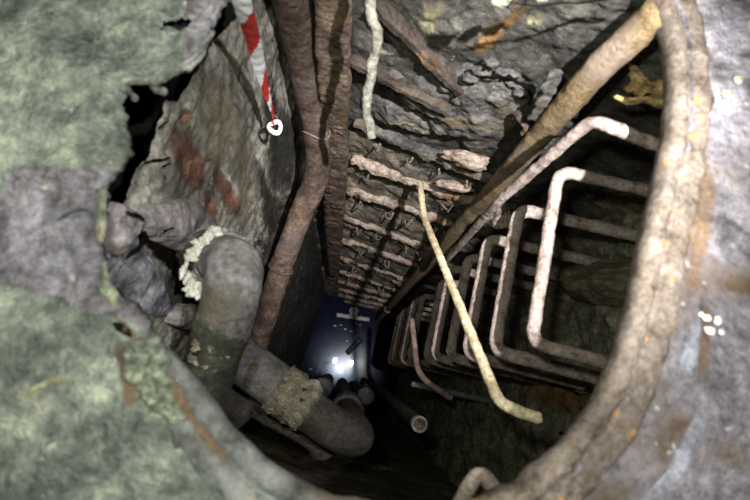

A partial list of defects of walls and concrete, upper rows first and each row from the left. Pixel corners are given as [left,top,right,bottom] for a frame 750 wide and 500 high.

rust [476,8,524,50]
rust [172,108,204,188]
rust [205,162,241,221]